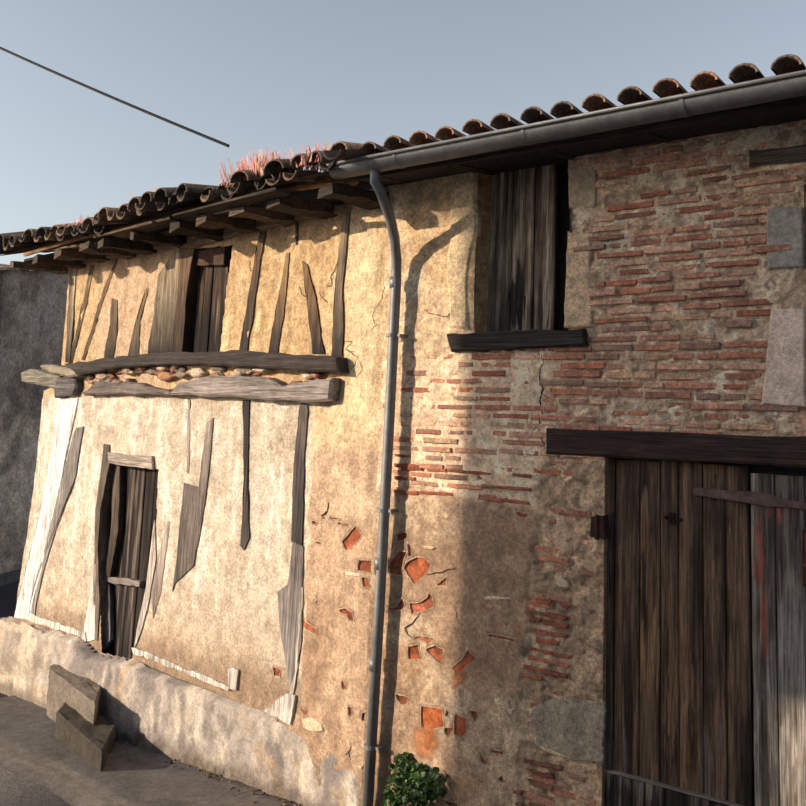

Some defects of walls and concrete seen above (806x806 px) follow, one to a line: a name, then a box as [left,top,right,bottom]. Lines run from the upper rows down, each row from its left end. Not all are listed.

flaking render [328,516,363,551]
flaking render [346,559,375,589]
flaking render [388,531,435,586]
flaking render [385,575,448,616]
flaking render [338,607,355,623]
flaking render [406,635,476,674]
flaking render [347,706,368,723]